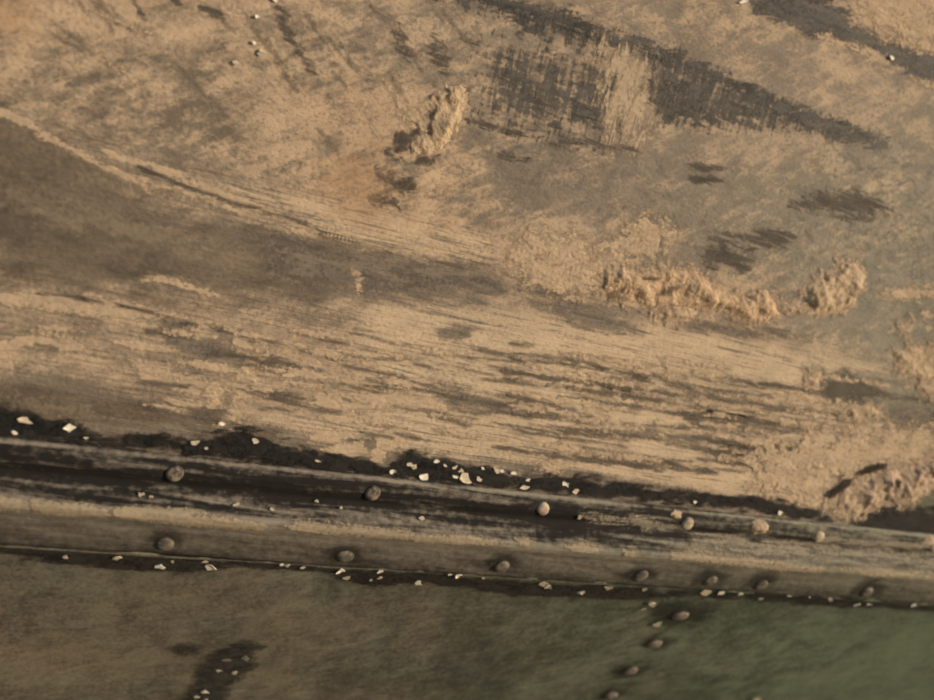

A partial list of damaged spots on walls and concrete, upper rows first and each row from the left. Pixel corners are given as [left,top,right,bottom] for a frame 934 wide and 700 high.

damp [438,325,471,340]
damp [685,319,790,340]
damp [139,322,343,414]
damp [0,383,278,434]
damp [318,332,934,474]
crack [828,463,901,499]
damp [176,641,267,700]